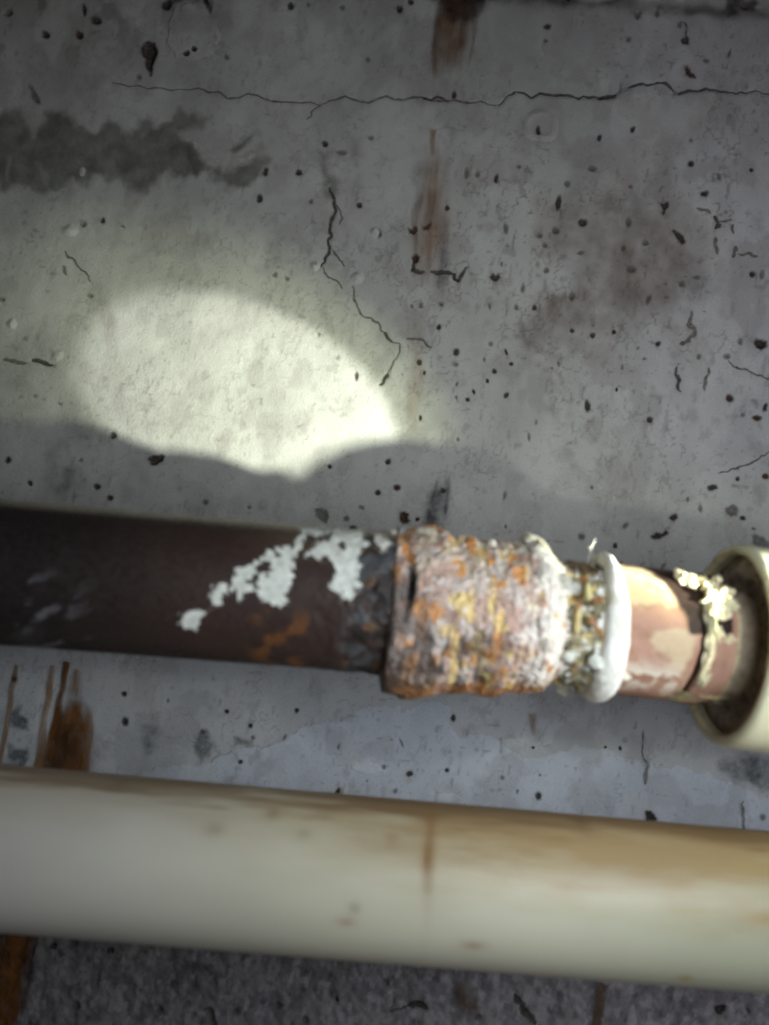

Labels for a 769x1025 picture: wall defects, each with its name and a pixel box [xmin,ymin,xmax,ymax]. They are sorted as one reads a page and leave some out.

corrosion [434,0,484,61]
crack [114,82,769,119]
damp [0,114,256,188]
crack [320,187,431,386]
corrosion [0,666,17,756]
corrosion [34,662,88,772]
corrosion [0,934,37,1025]